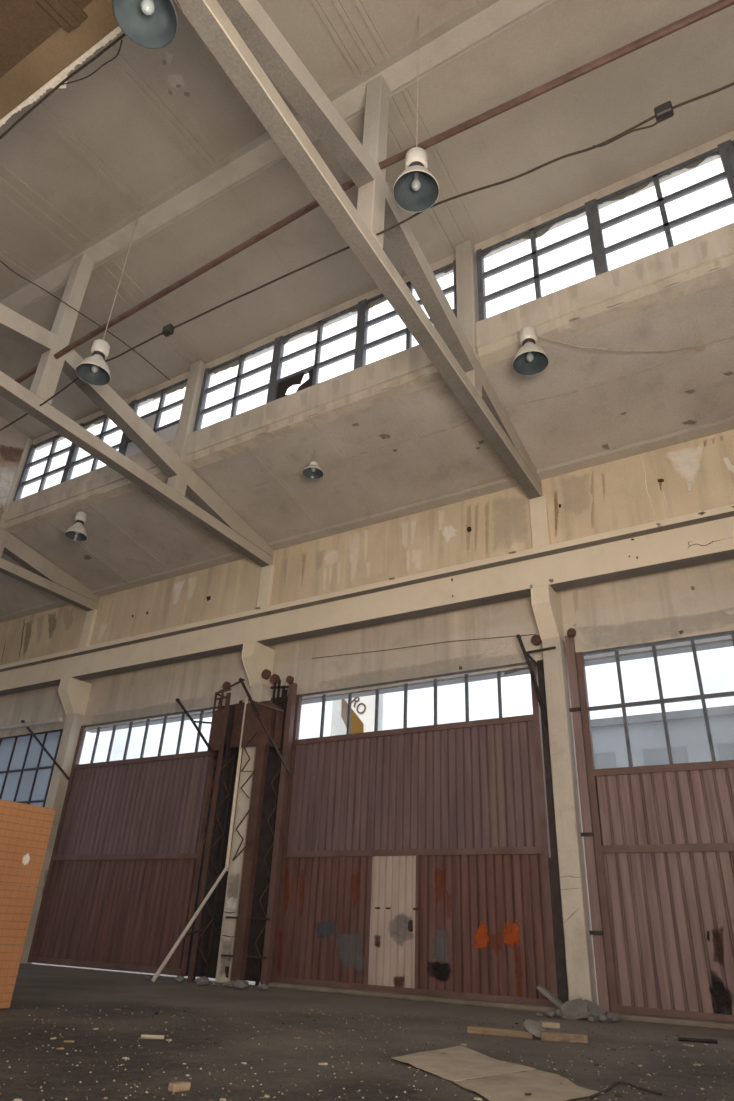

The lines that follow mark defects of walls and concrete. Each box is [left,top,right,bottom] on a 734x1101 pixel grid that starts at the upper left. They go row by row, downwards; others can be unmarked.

peeling [0,436,63,472]
water stain [438,493,531,556]